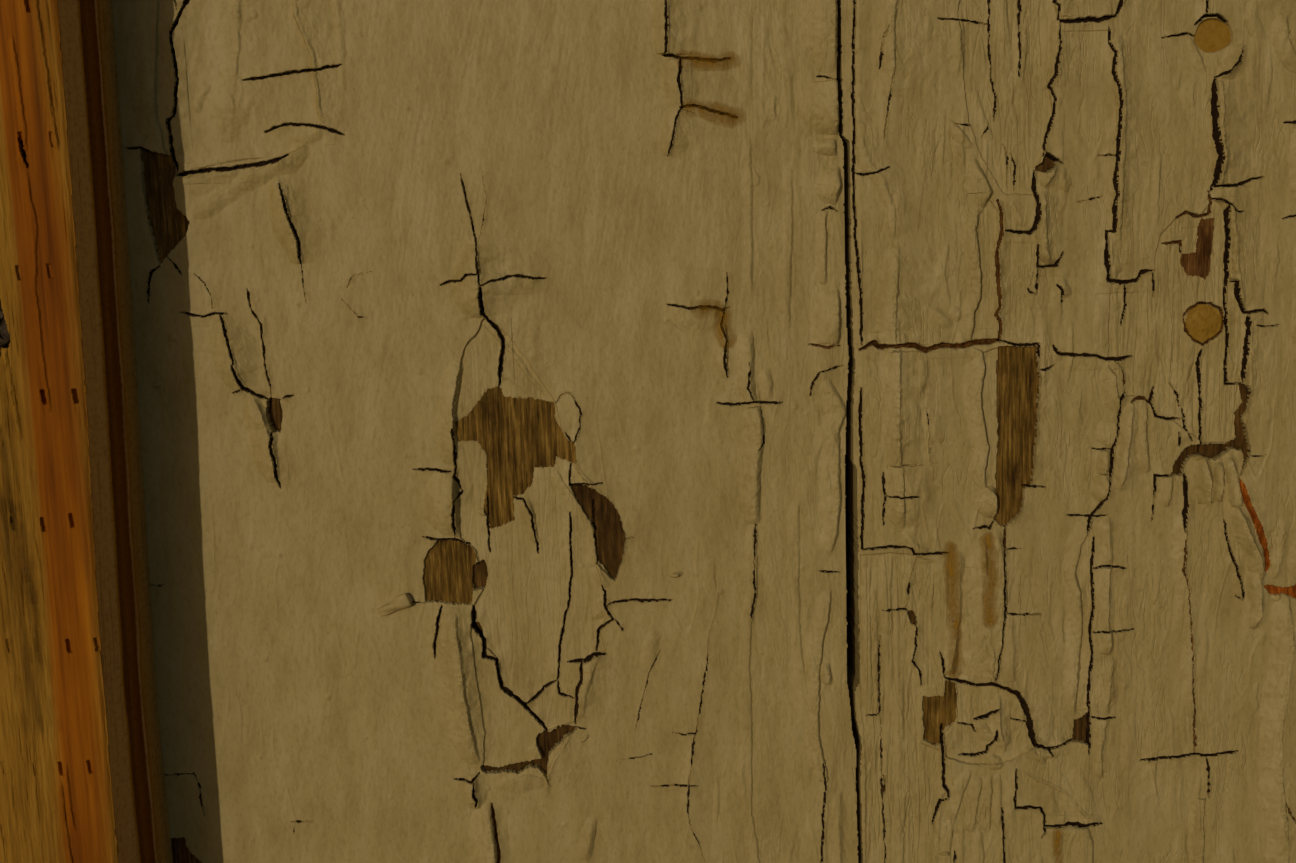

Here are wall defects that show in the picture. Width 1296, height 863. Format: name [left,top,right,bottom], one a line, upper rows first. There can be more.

peeling [128,0,361,301]
peeling [184,287,294,486]
peeling [377,179,670,810]
crack [861,527,947,556]
crack [859,331,997,367]
peeling [851,0,1296,863]
crack [1141,540,1237,863]
peeling [171,837,202,863]
crack [1001,758,1104,863]